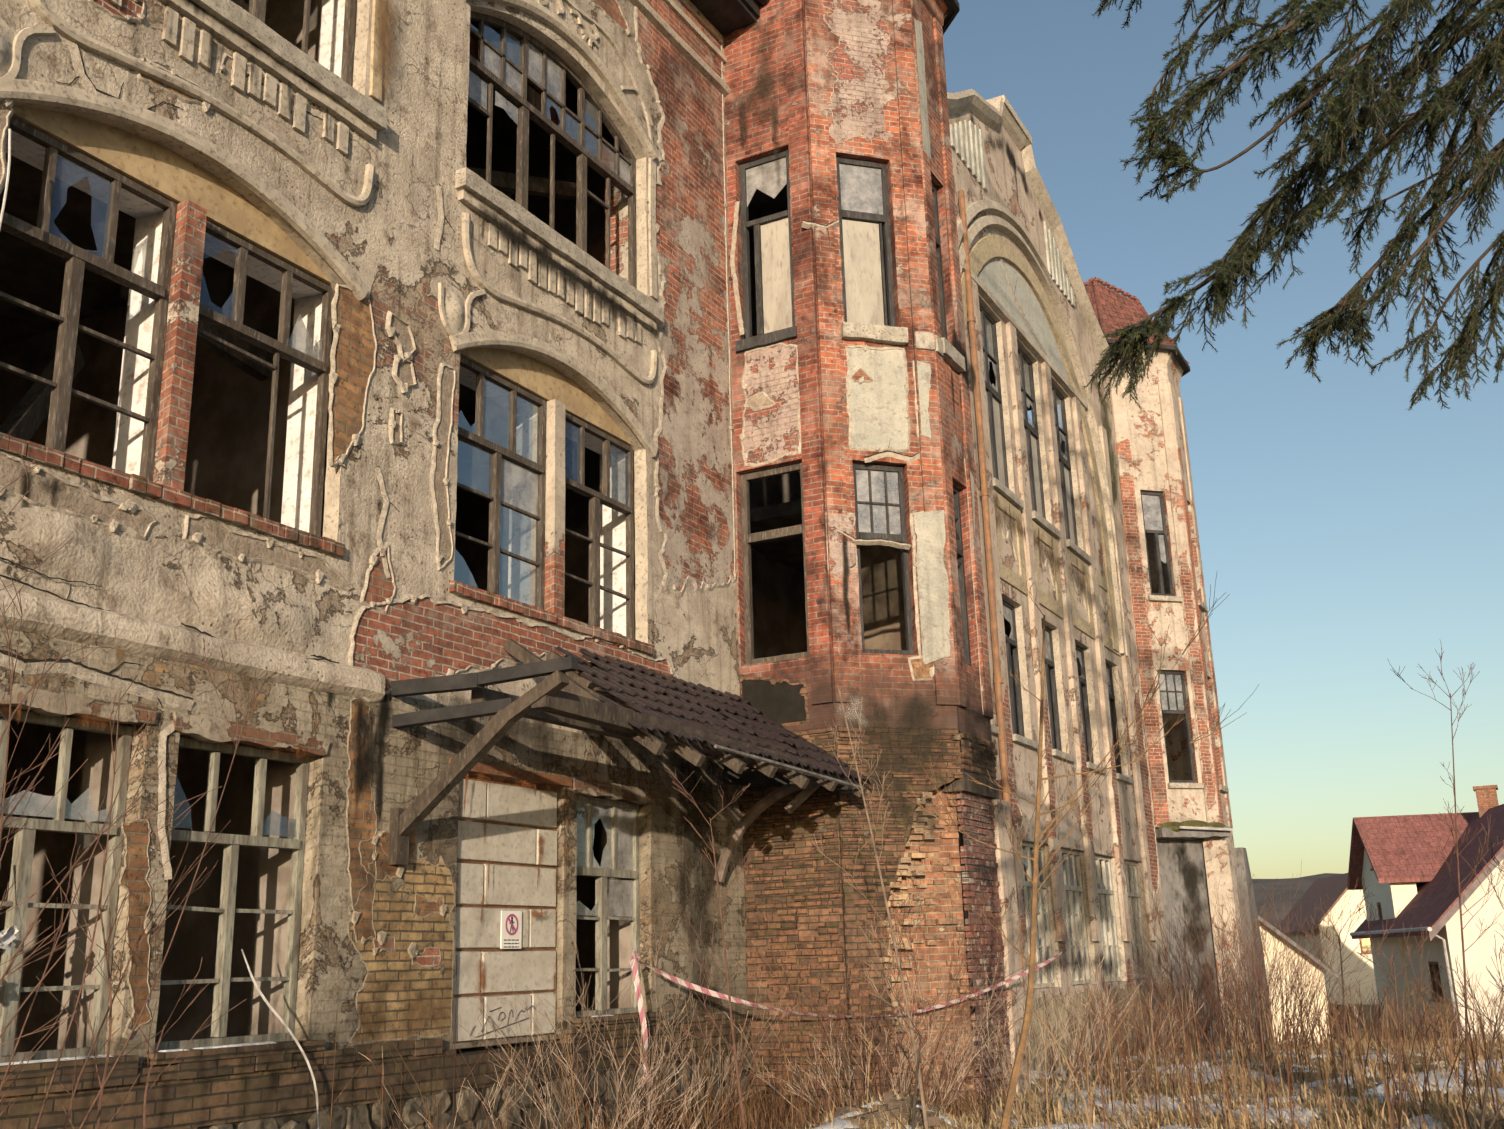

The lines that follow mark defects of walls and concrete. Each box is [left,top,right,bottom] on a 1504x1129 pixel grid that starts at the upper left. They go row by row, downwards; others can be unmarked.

peeling [823,0,894,144]
flaking render [328,283,417,468]
flaking render [430,362,456,571]
flaking render [590,0,801,598]
crack [292,651,339,663]
water stain [355,689,390,818]
flaking render [182,513,675,1044]
water stain [849,696,933,822]
water stain [973,731,996,795]
flaking render [1106,493,1167,898]
flaking render [1177,550,1217,811]
flaking render [119,818,153,1040]